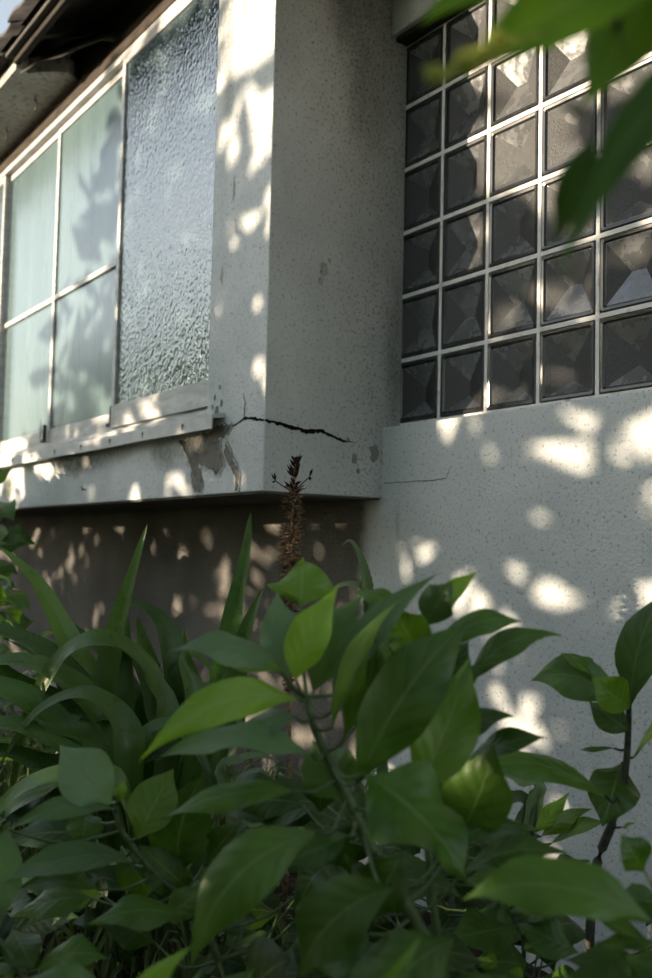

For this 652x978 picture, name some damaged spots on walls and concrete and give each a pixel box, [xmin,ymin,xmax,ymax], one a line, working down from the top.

peeling [178,385,241,495]
crack [212,396,352,443]
crack [384,471,449,484]